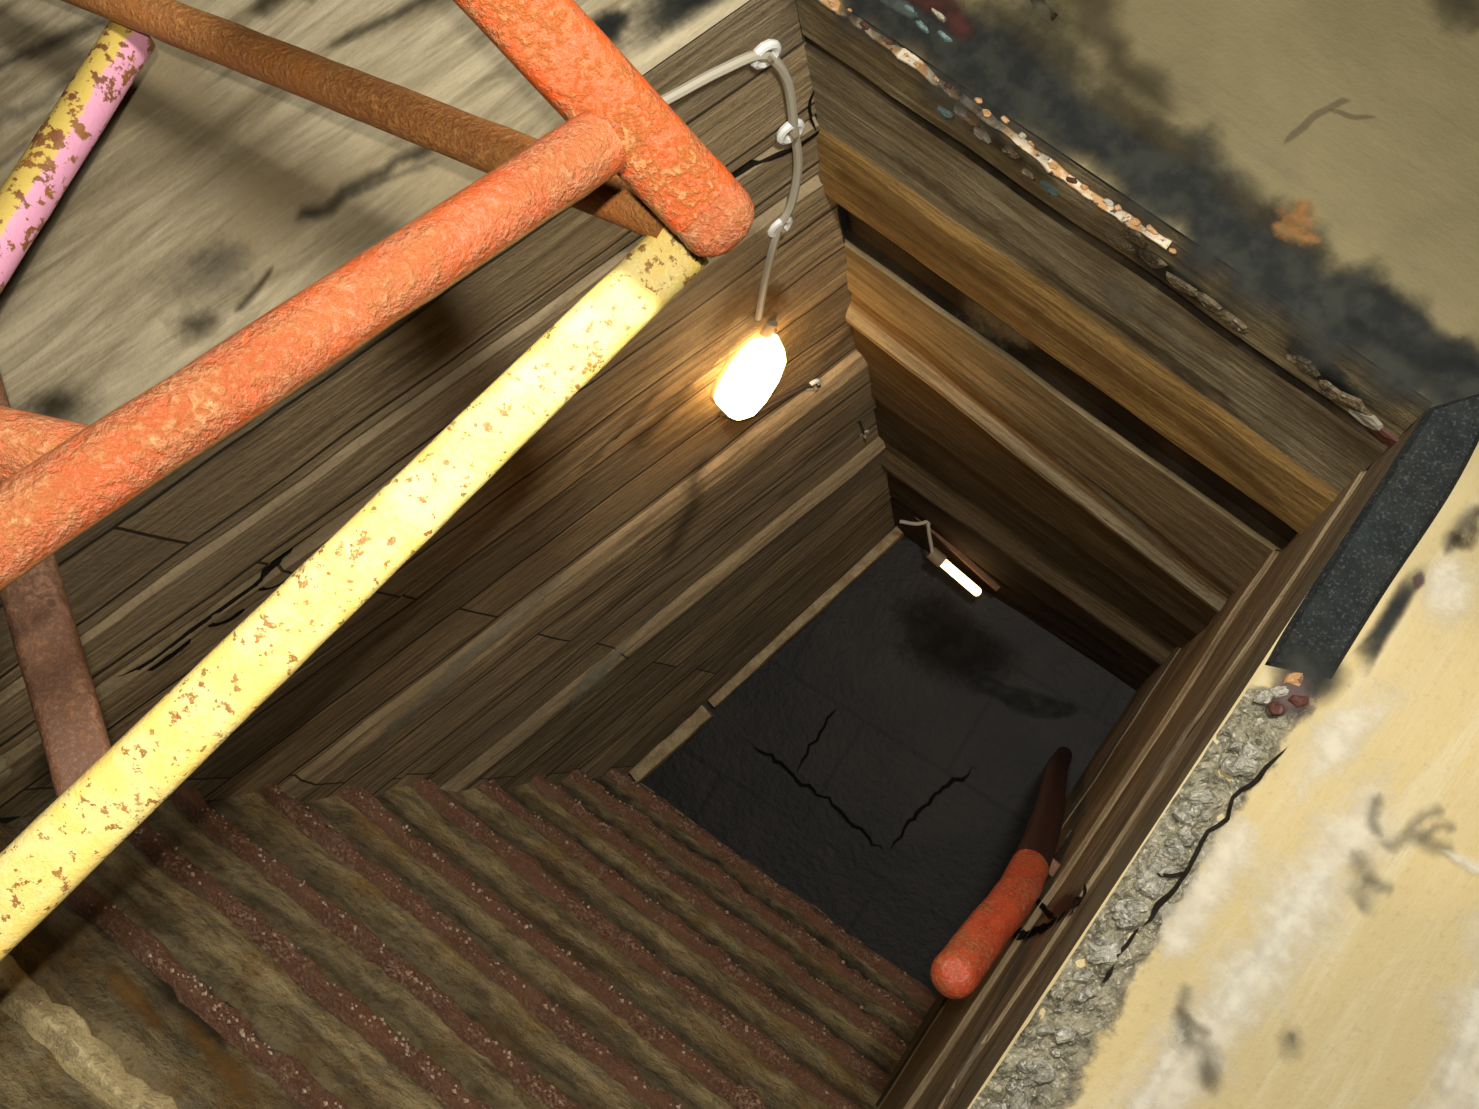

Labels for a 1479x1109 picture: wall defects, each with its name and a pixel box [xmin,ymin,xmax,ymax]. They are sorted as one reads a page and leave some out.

leakage [593,0,716,42]
leakage [842,0,1479,412]
crack [754,709,971,848]
rust [201,808,305,887]
spalling [970,687,1317,1109]
crack [1102,748,1286,983]
rust [170,968,307,1094]
rust [326,982,486,1109]
rust [405,971,449,1002]
rust [467,1023,562,1104]
rust [464,877,710,1073]